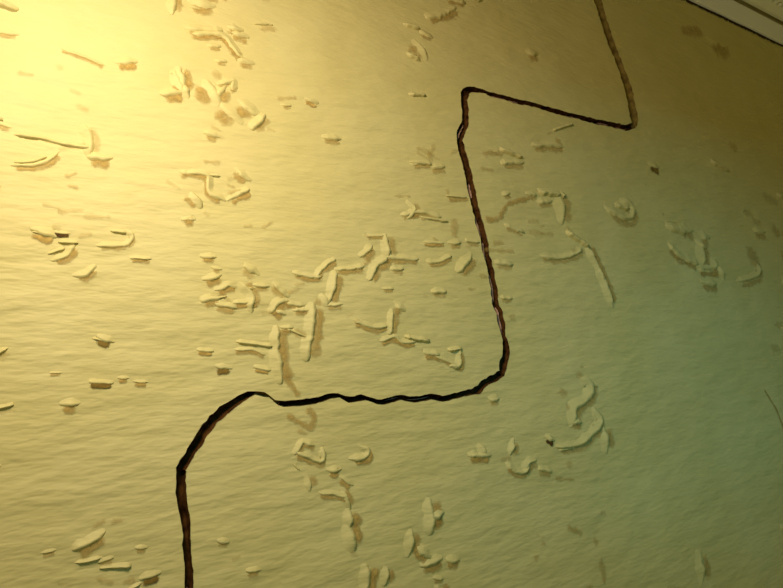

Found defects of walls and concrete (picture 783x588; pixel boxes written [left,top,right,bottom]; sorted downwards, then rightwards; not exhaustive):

crack [175,0,638,588]
crack [686,0,783,47]